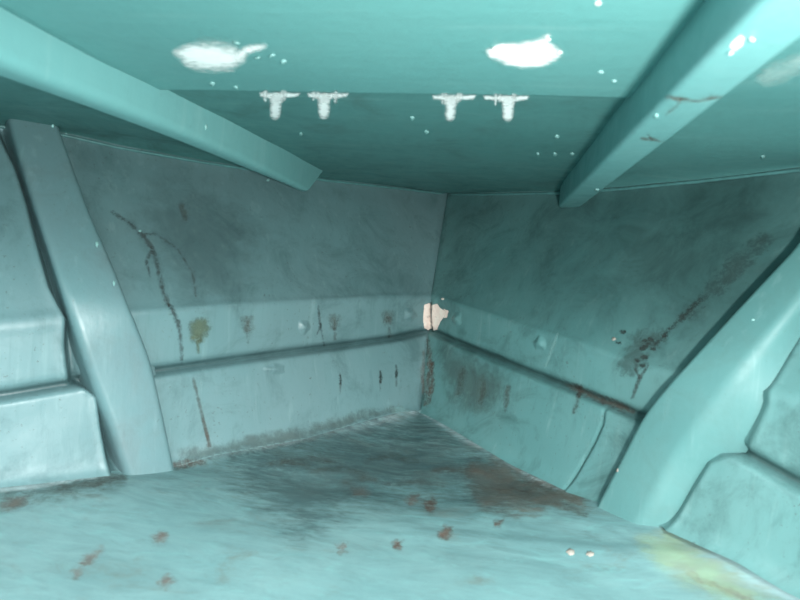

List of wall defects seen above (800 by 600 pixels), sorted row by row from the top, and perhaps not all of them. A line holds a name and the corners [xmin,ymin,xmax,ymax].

crack [669,96,721,112]
spalling [423,298,449,330]
damp [190,319,209,351]
rust [570,384,635,413]